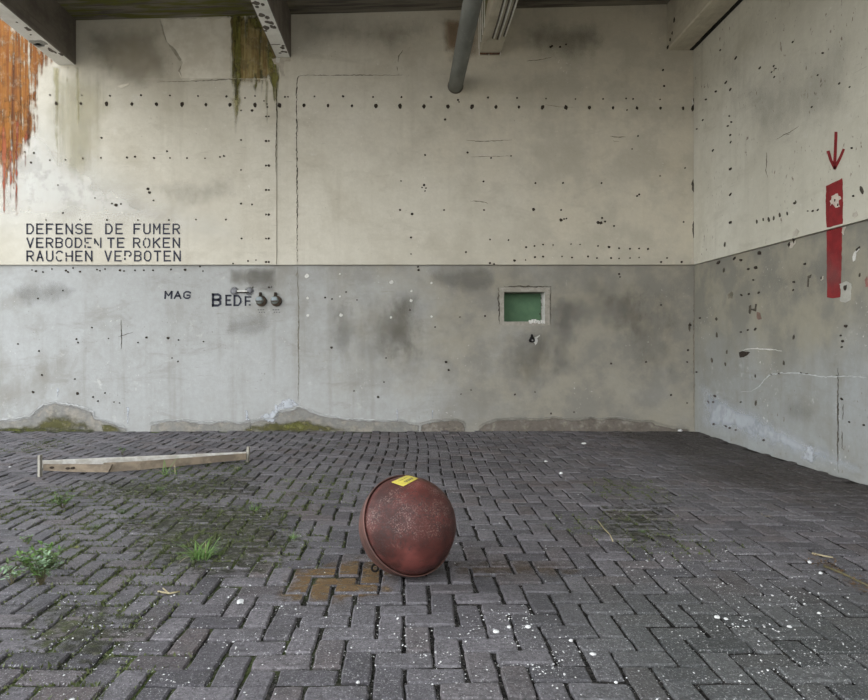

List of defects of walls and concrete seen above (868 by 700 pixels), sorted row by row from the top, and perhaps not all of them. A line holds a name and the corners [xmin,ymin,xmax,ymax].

water stain [230,15,283,114]
rust [0,19,52,211]
efflorescence [261,399,297,422]